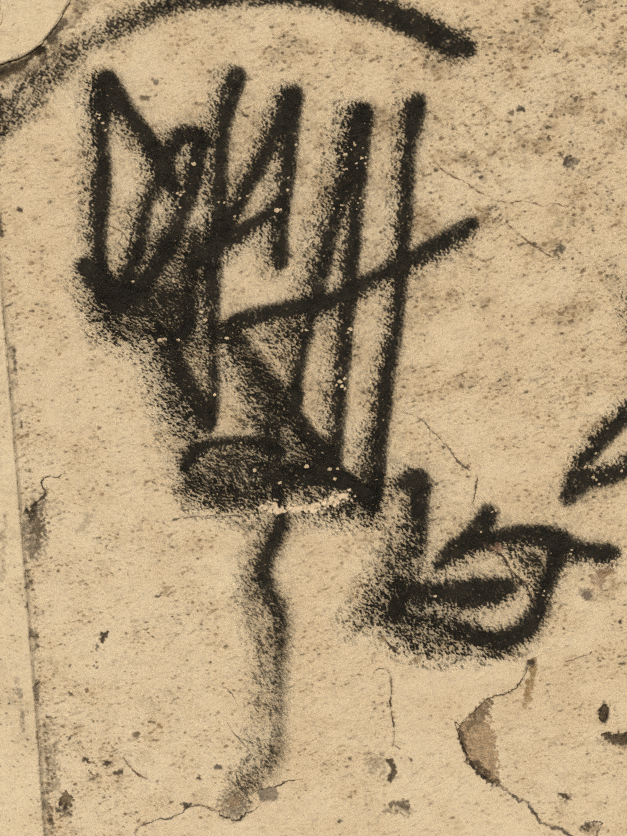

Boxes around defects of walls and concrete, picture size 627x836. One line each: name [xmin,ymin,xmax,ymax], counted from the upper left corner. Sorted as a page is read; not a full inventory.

spalling [454,666,603,836]
spalling [601,731,627,748]
crack [135,803,215,836]